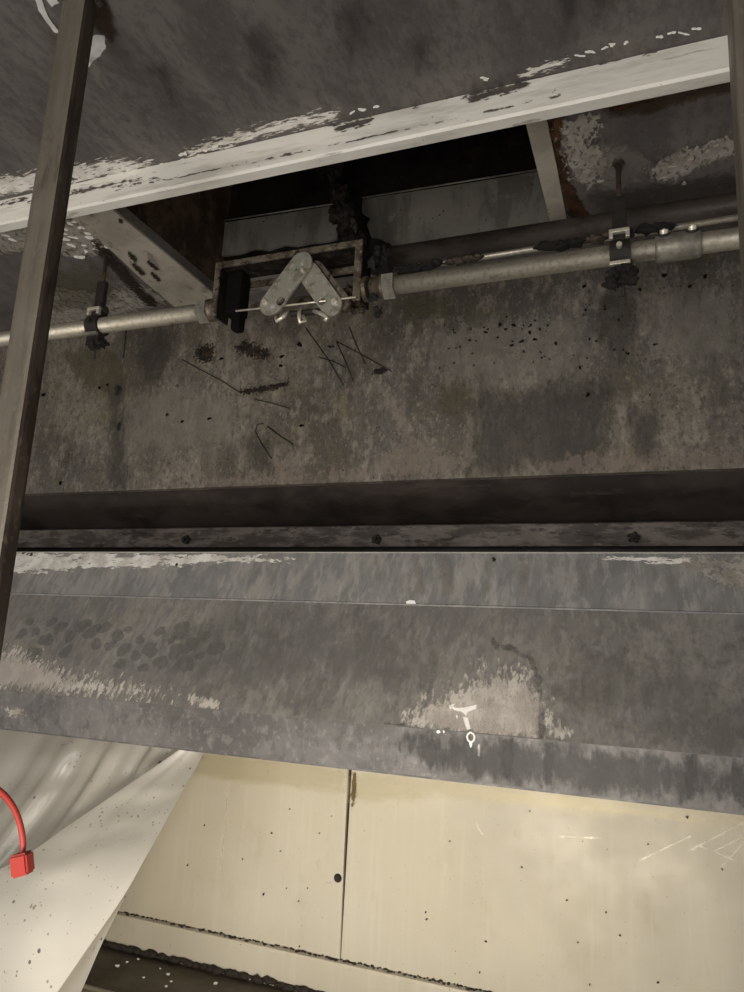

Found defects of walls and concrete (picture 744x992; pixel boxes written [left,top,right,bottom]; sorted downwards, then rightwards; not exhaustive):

rust [547,117,589,218]
peeling [555,112,614,190]
peeling [644,132,734,185]
peeling [400,659,573,741]